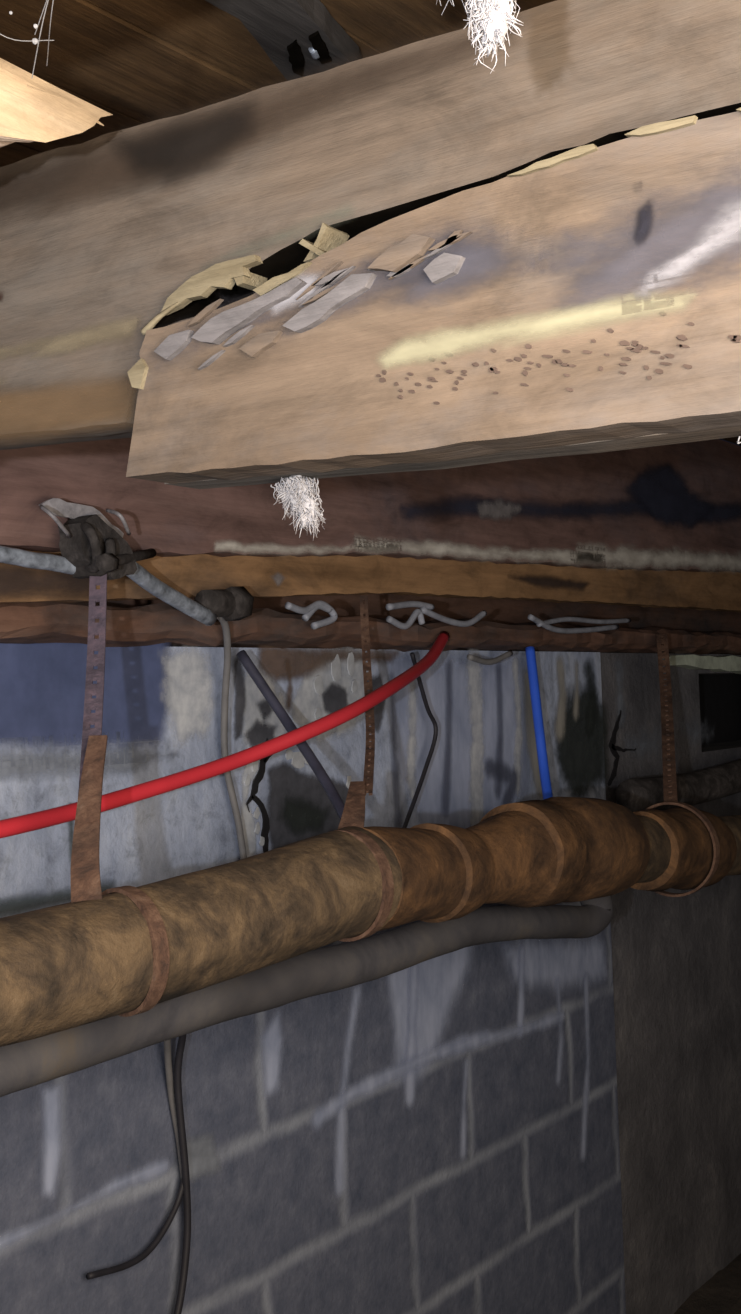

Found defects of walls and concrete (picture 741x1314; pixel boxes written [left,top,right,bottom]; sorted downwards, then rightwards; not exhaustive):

crack [216,292,256,309]